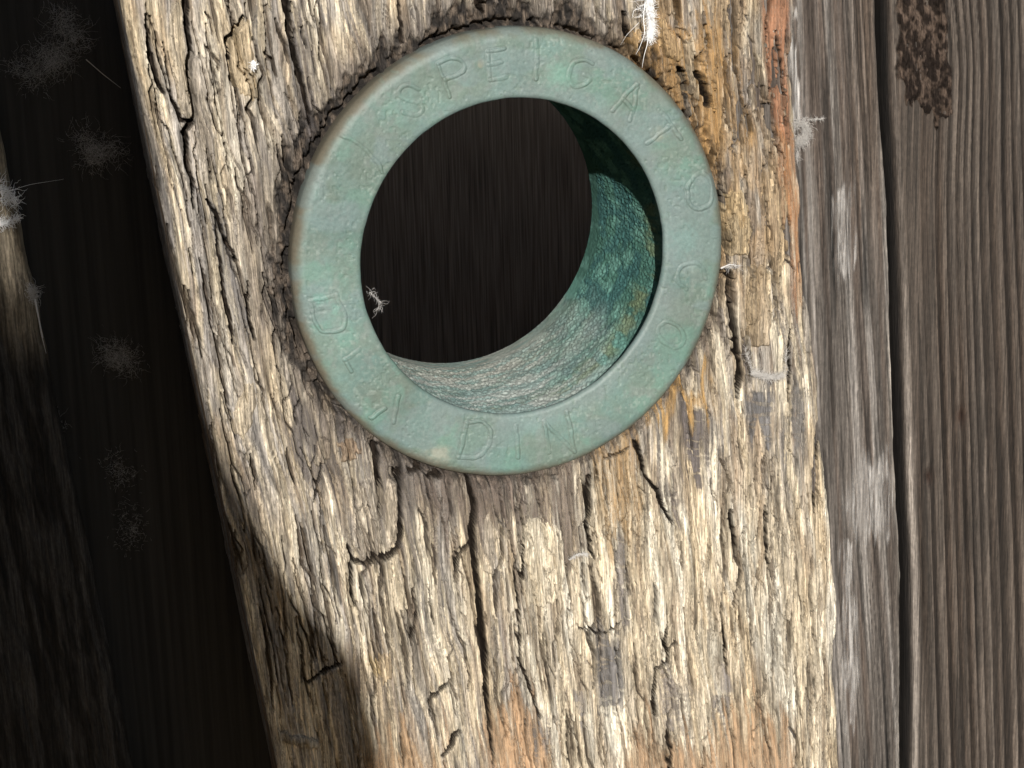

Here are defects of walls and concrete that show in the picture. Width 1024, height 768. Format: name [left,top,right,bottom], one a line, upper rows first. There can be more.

crack [144,0,254,344]
crack [346,440,495,767]
crack [582,439,673,556]